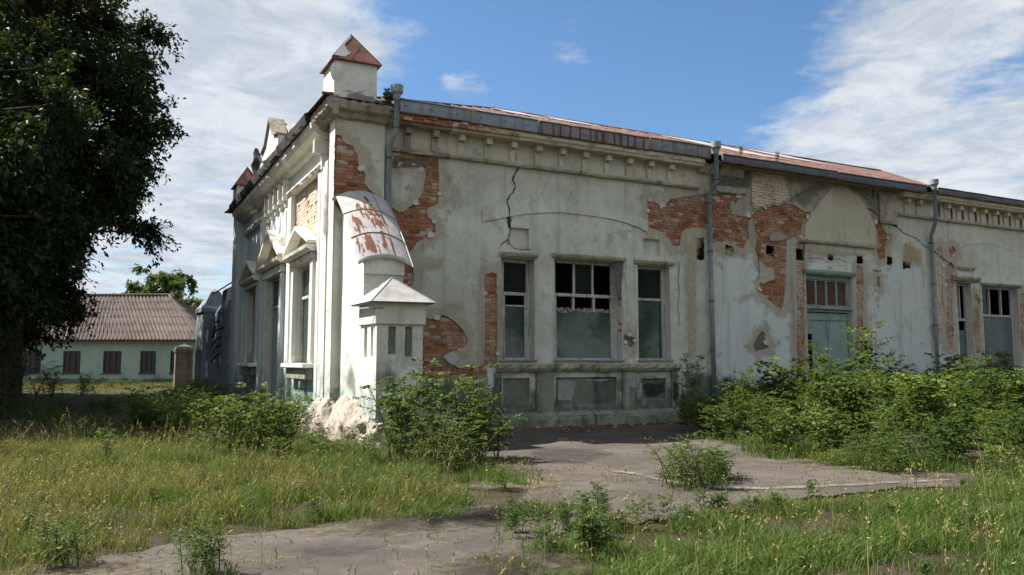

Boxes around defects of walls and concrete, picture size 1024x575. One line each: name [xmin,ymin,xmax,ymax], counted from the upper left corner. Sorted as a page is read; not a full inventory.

flaking render [295,177,318,237]
flaking render [332,135,374,218]
rust [351,196,396,255]
flaking render [392,152,442,286]
crack [499,155,541,250]
flaking render [646,171,813,377]
crack [868,190,1005,267]
flaking render [396,273,500,400]